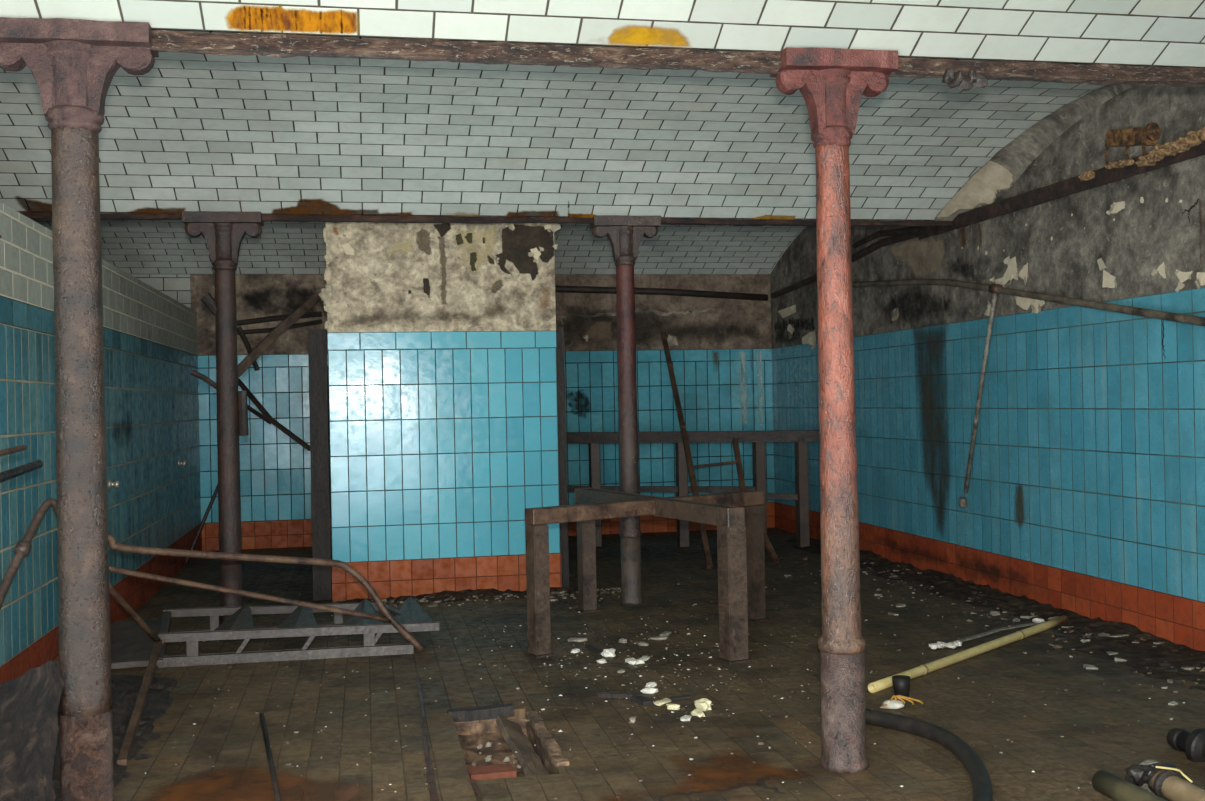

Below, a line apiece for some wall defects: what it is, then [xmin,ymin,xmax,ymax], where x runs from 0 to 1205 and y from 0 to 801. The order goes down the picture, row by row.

rust [227,6,358,34]
rust [609,26,688,46]
rust [16,197,52,212]
peeling [1106,201,1125,221]
spalling [417,228,431,255]
spalling [323,228,355,330]
spalling [408,278,430,296]
spalling [455,224,561,293]
peeling [990,250,1045,313]
peeling [1097,258,1117,288]
peeling [1151,262,1205,292]
leakage [887,292,949,527]